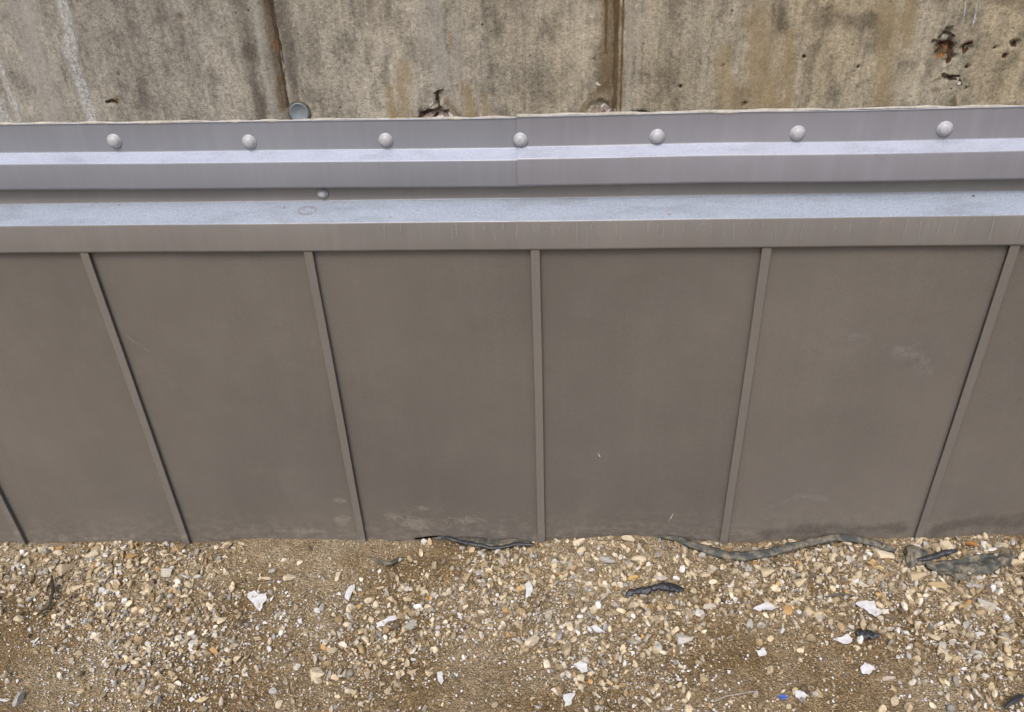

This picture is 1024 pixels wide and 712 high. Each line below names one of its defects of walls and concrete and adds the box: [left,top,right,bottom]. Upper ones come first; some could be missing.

spalling [414,89,457,118]